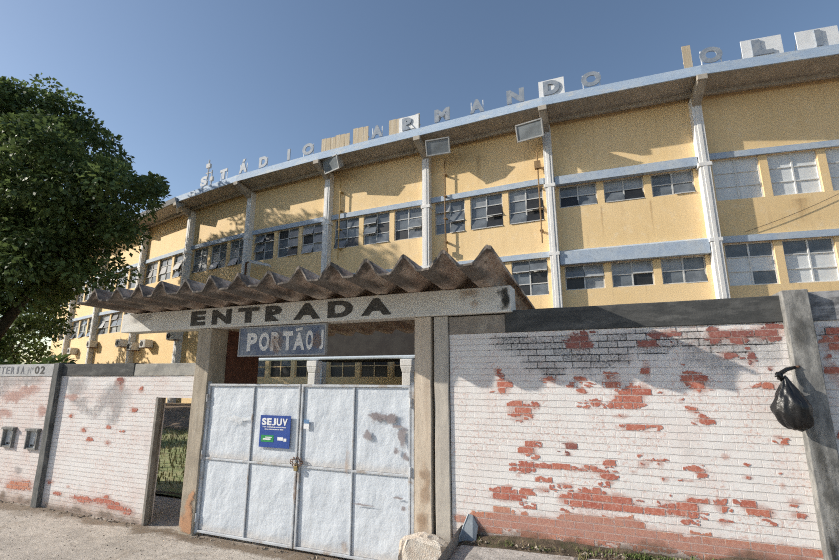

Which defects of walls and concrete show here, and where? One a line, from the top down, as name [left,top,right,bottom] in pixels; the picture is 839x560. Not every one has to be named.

peeling [562,330,596,350]
peeling [637,331,682,347]
peeling [705,323,784,365]
peeling [818,327,839,379]
peeling [490,369,513,393]
peeling [680,364,713,392]
peeling [506,400,539,423]
peeling [565,371,663,431]
peeling [681,398,716,425]
peeling [363,412,409,461]
peeling [47,480,132,515]
peeling [454,441,823,560]